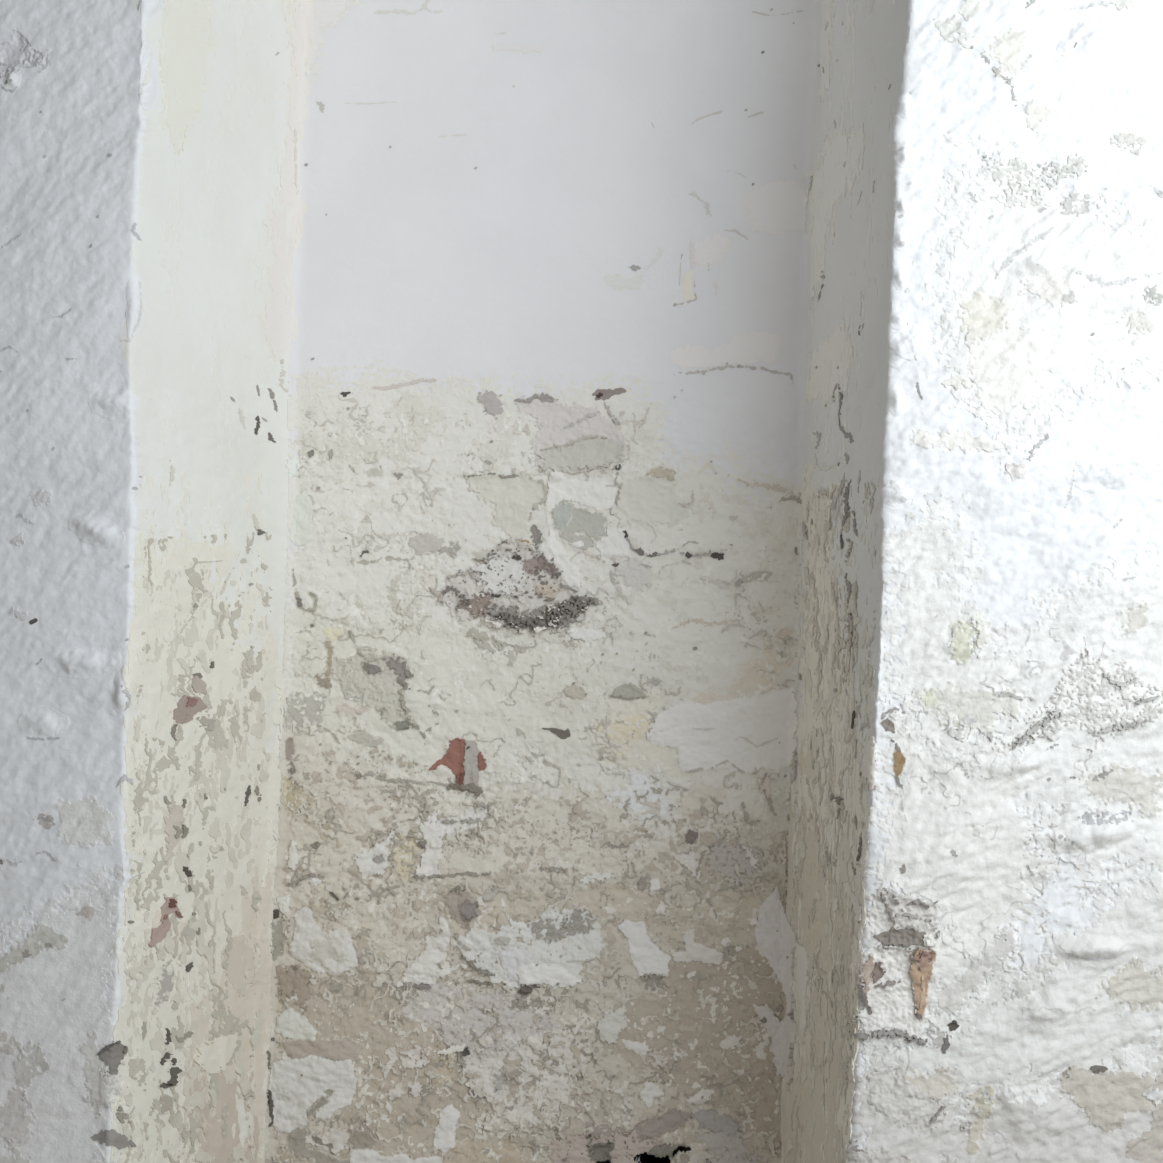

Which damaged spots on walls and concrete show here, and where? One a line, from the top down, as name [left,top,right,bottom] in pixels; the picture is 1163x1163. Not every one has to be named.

spalling [517,388,631,476]
spalling [437,498,609,654]
spalling [173,675,216,731]
spalling [315,650,417,730]
flaking render [429,738,486,799]
peeling [542,728,571,739]
water stain [0,352,1163,1163]
spalling [148,897,197,947]
peeling [163,789,788,1163]
spalling [855,886,940,1045]
corrosion [909,946,937,1020]
spalling [90,1129,137,1149]